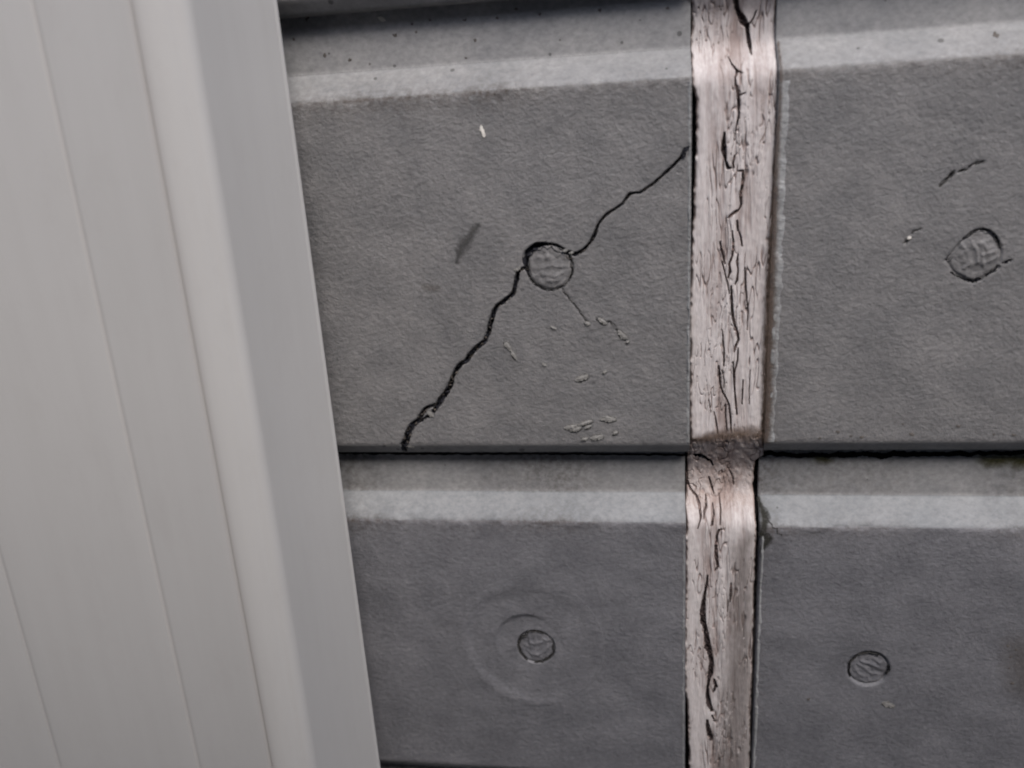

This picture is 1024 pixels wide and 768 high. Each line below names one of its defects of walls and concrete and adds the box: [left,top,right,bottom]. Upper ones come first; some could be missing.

crack [398,145,690,451]
peeling [564,416,619,441]
crack [708,0,757,432]
crack [939,159,983,187]
crack [685,454,734,741]